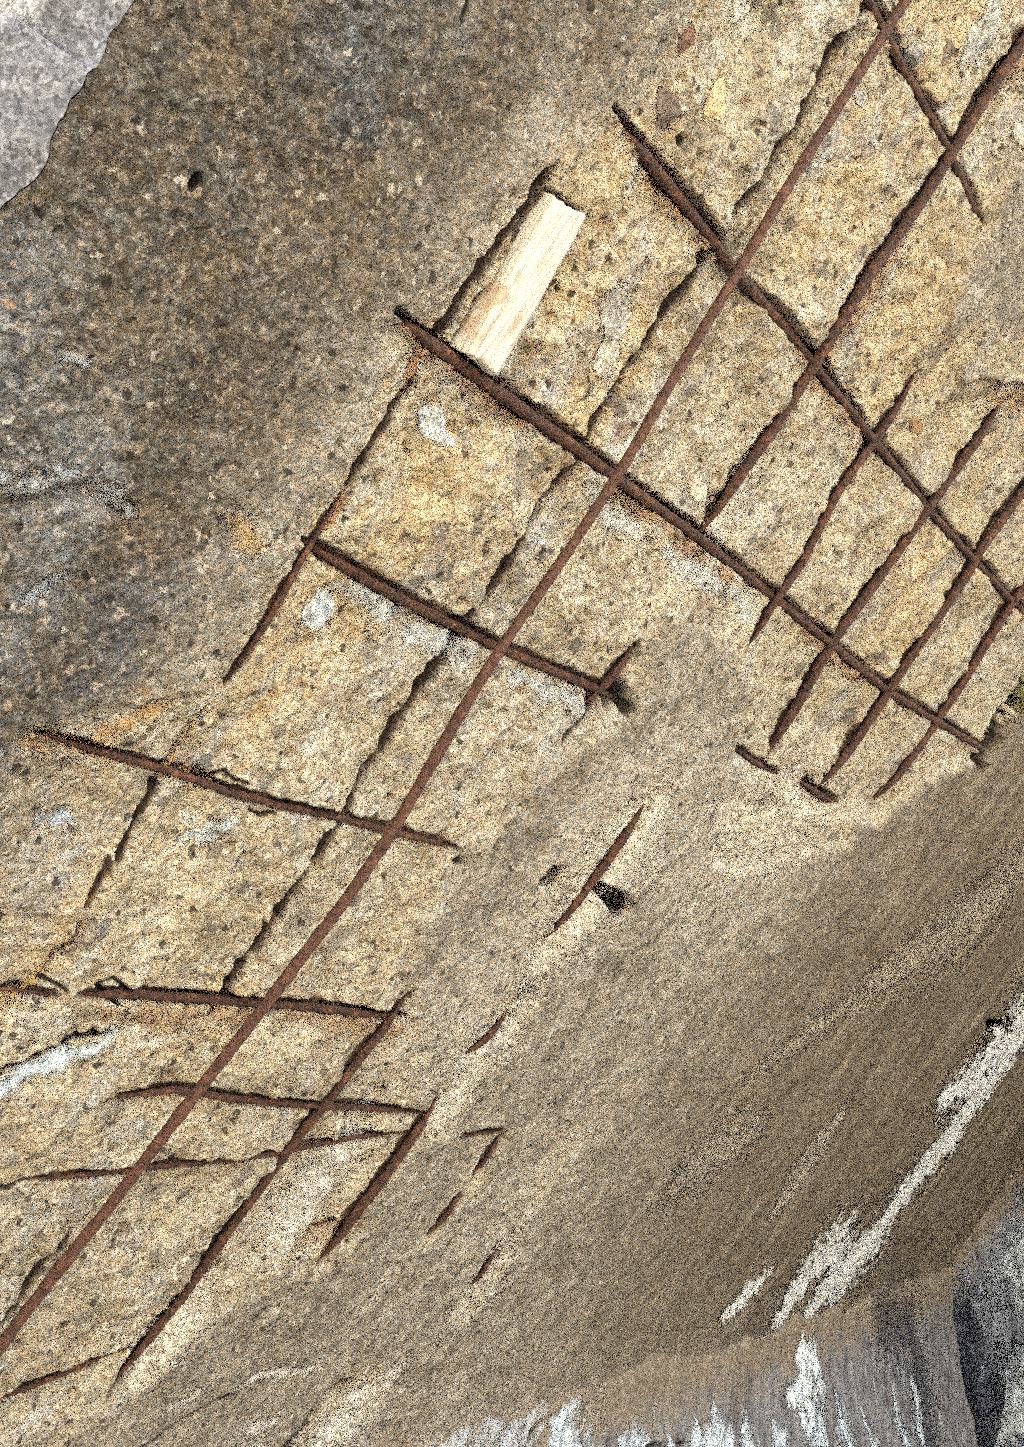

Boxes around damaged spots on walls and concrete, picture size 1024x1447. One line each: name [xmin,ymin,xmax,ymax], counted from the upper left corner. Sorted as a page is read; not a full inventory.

crack [458,0,473,27]
corrosion [400,348,420,390]
spalling [482,0,1024,878]
spalling [0,175,627,1447]
spalling [526,783,667,966]
corrosion [11,922,85,998]
crack [0,1176,31,1195]
leakage [771,992,1024,1333]
leakage [719,1267,773,1322]
leakage [741,1418,753,1447]
leakage [876,1300,933,1447]
leakage [953,1297,1024,1447]